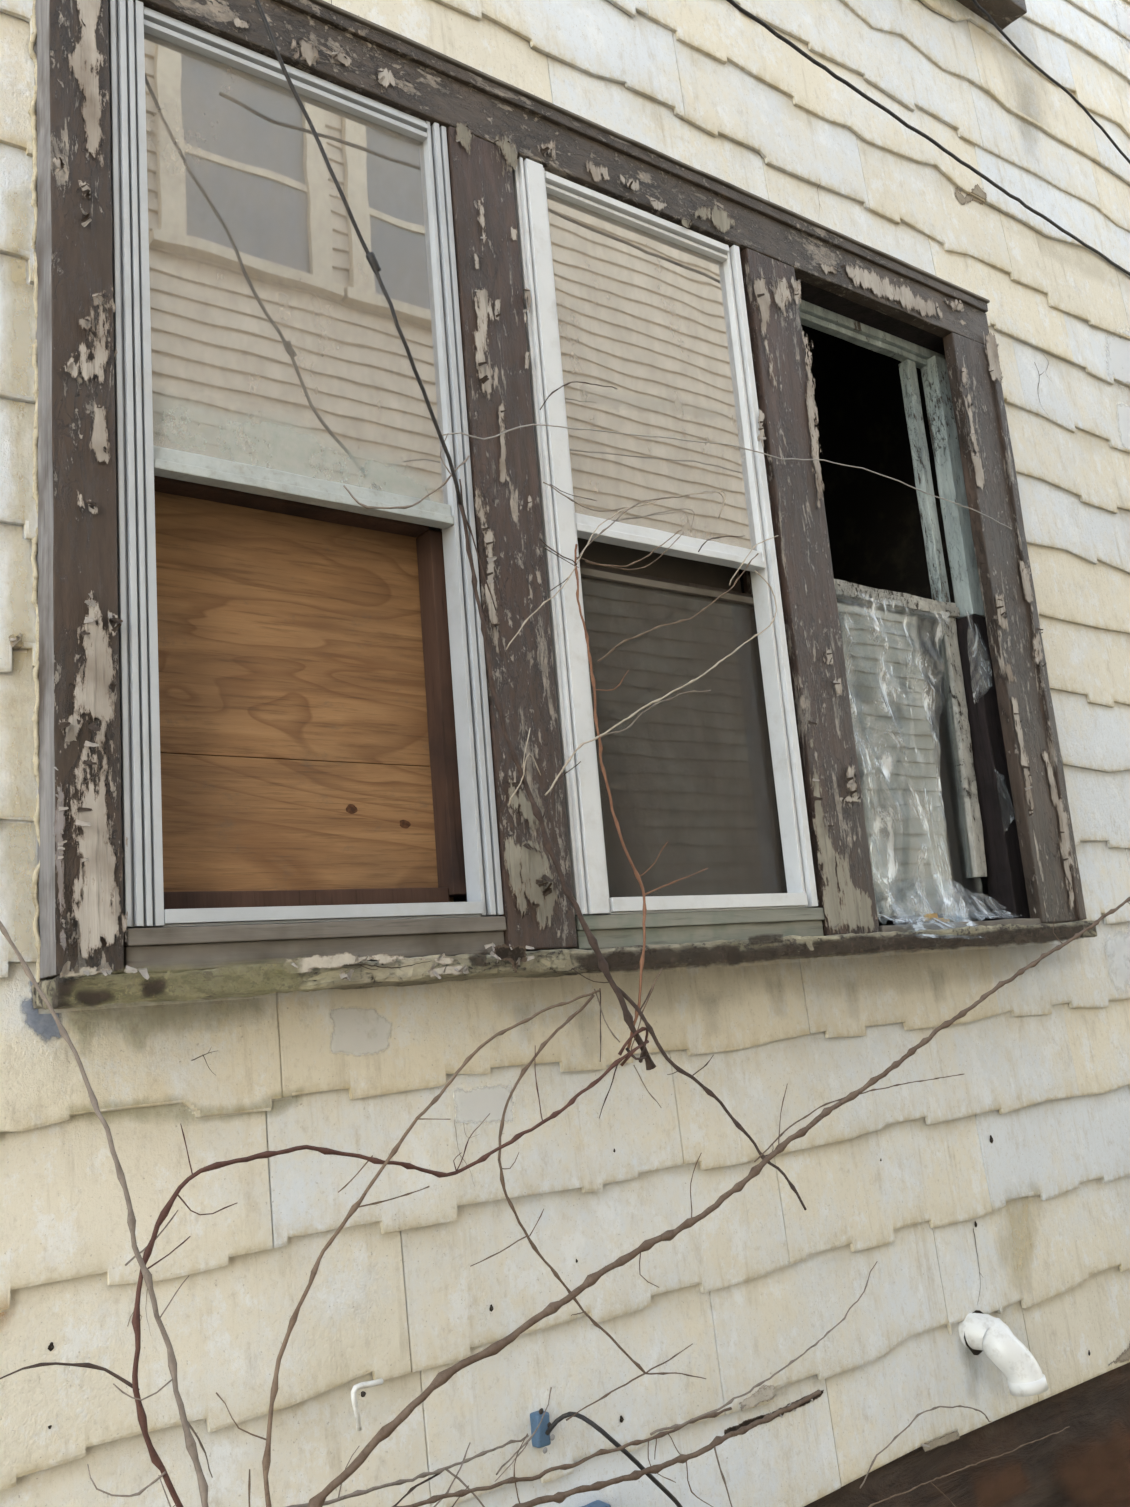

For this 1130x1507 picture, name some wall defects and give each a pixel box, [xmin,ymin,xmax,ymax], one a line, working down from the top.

peeling [68,0,109,169]
peeling [89,404,111,464]
peeling [472,288,510,483]
peeling [754,276,801,389]
peeling [801,329,824,508]
peeling [821,261,964,318]
peeling [470,486,500,654]
peeling [54,590,149,980]
peeling [503,775,559,930]
peeling [807,717,875,934]
peeling [1003,664,1078,910]
peeling [285,952,469,981]